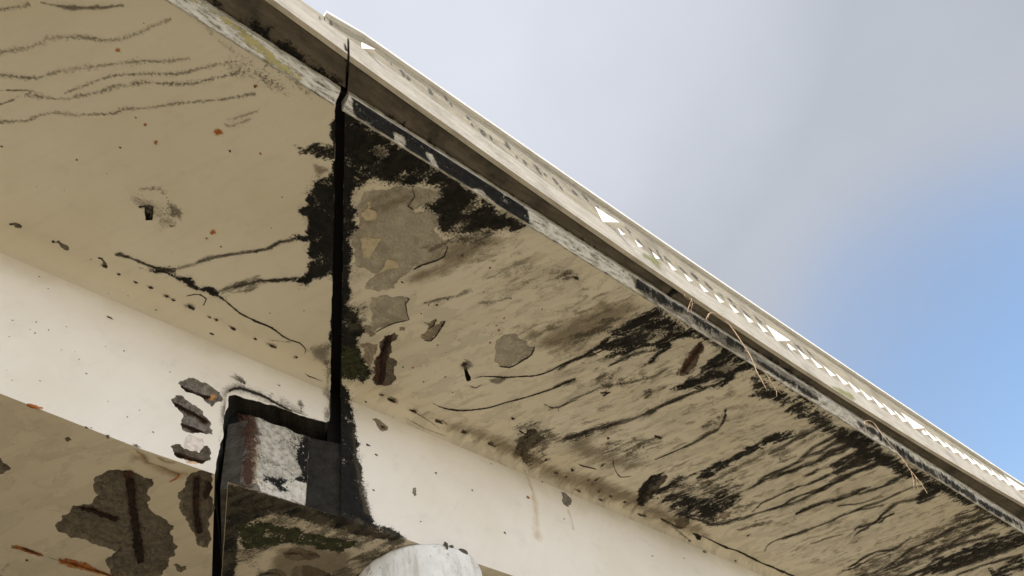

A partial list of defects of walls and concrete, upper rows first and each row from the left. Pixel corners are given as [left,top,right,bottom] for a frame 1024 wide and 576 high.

spalling [55,469,187,576]
spalling [171,378,223,548]
rust [240,415,260,489]
water stain [115,97,531,576]
peeling [351,186,448,386]
crack [412,350,604,419]
peeling [494,333,535,368]
water stain [552,274,1024,576]